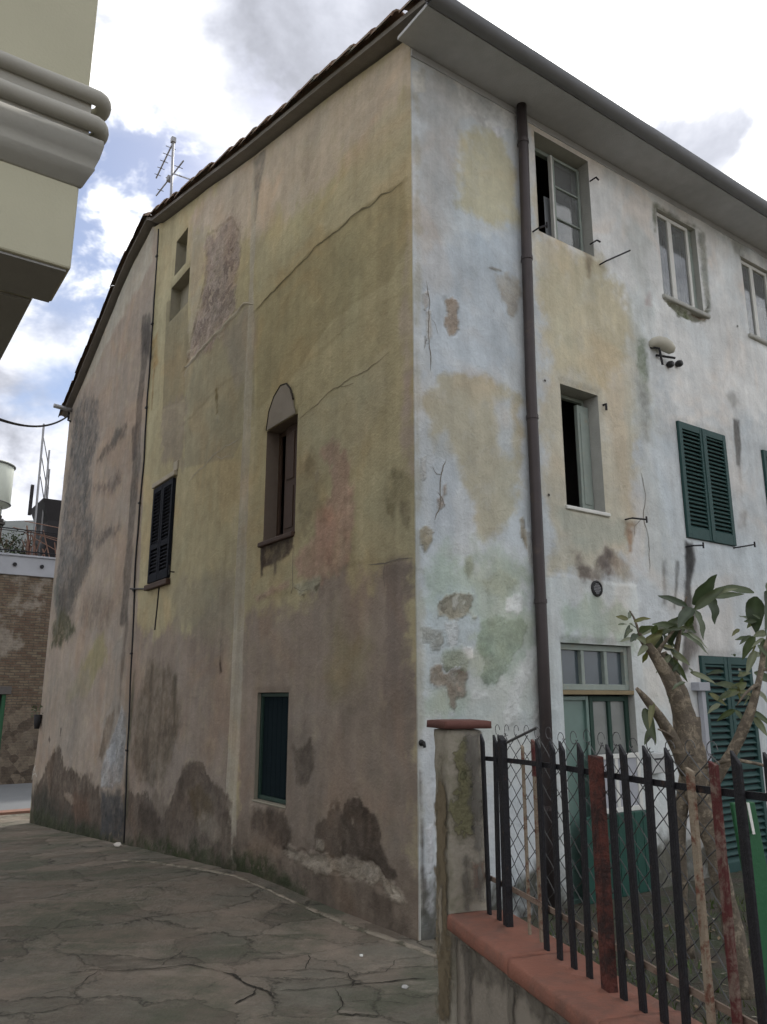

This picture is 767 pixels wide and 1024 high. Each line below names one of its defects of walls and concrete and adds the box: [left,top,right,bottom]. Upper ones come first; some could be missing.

crack [424,281,438,371]
flaking render [420,288,461,345]
peeling [417,522,435,555]
crack [433,461,446,518]
water stain [565,542,642,591]
crack [634,468,650,560]
water stain [50,309,560,1024]
peeling [420,589,555,751]
water stain [31,742,100,826]
flaking render [282,836,409,907]
water stain [656,817,673,889]
crack [44,951,425,1016]